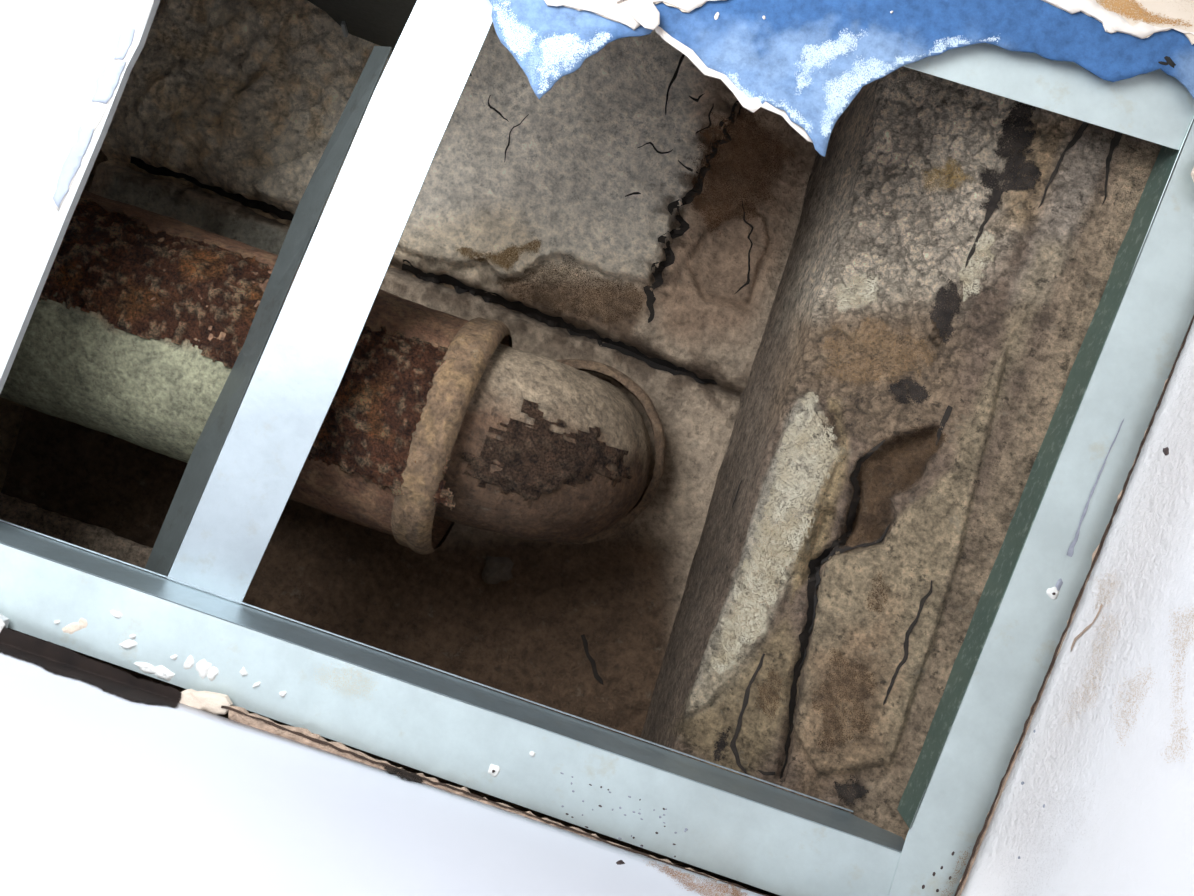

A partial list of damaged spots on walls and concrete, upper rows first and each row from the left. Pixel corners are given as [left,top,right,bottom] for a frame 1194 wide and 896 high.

peeling [615,0,660,30]
peeling [92,27,135,104]
peeling [53,126,94,208]
crack [130,156,317,231]
crack [402,54,742,385]
crack [735,200,754,294]
crack [965,188,1000,268]
crack [1037,122,1122,209]
peeling [133,655,219,681]
crack [730,439,891,779]
crack [883,580,932,705]